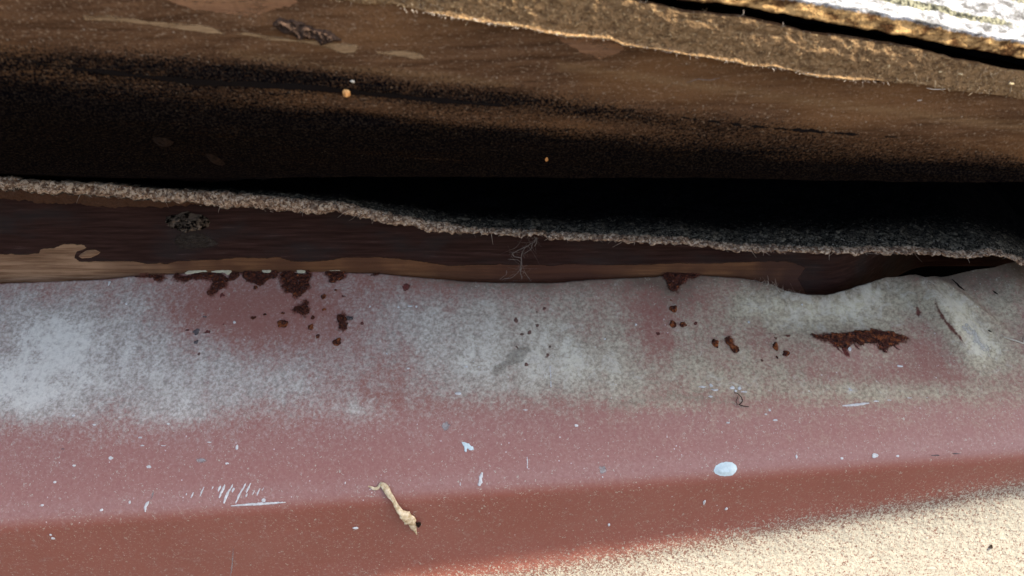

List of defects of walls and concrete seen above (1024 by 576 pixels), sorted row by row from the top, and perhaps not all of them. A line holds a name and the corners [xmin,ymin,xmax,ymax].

corrosion [135,270,364,346]
corrosion [656,272,700,335]
corrosion [810,328,909,357]